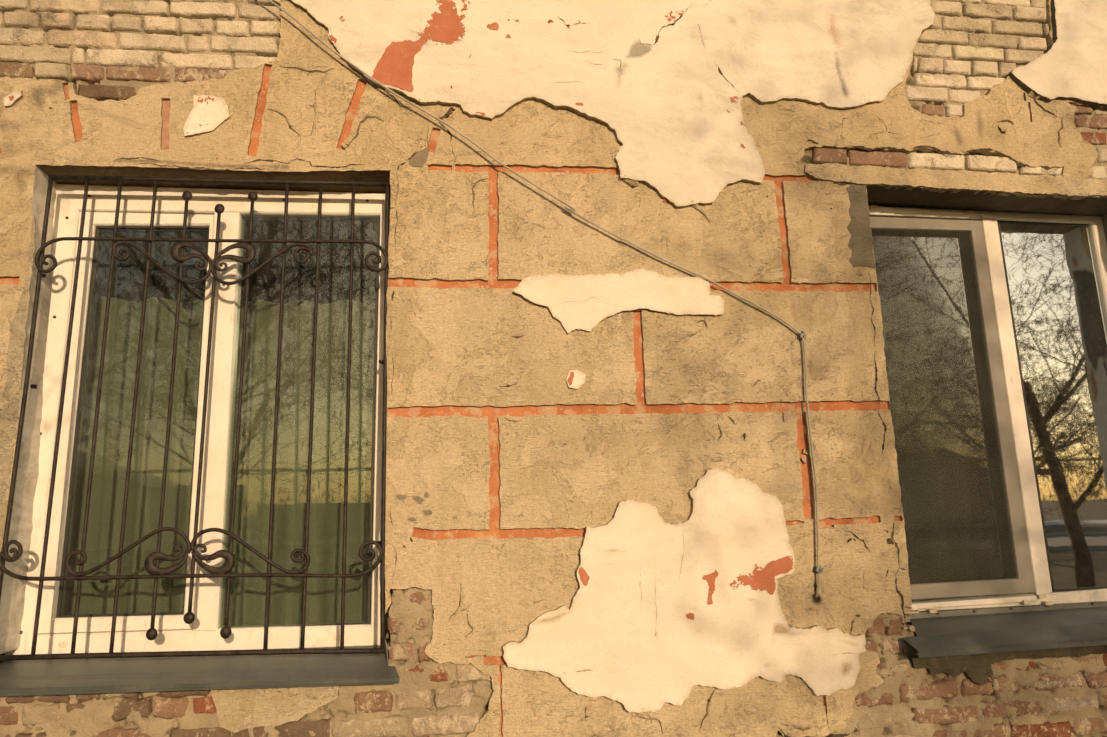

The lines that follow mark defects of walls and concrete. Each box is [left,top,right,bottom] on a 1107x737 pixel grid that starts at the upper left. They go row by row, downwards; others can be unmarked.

peeling [0,0,1107,208]
crack [868,272,887,453]
spalling [0,587,493,737]
peeling [502,467,1107,737]
crack [832,524,913,656]